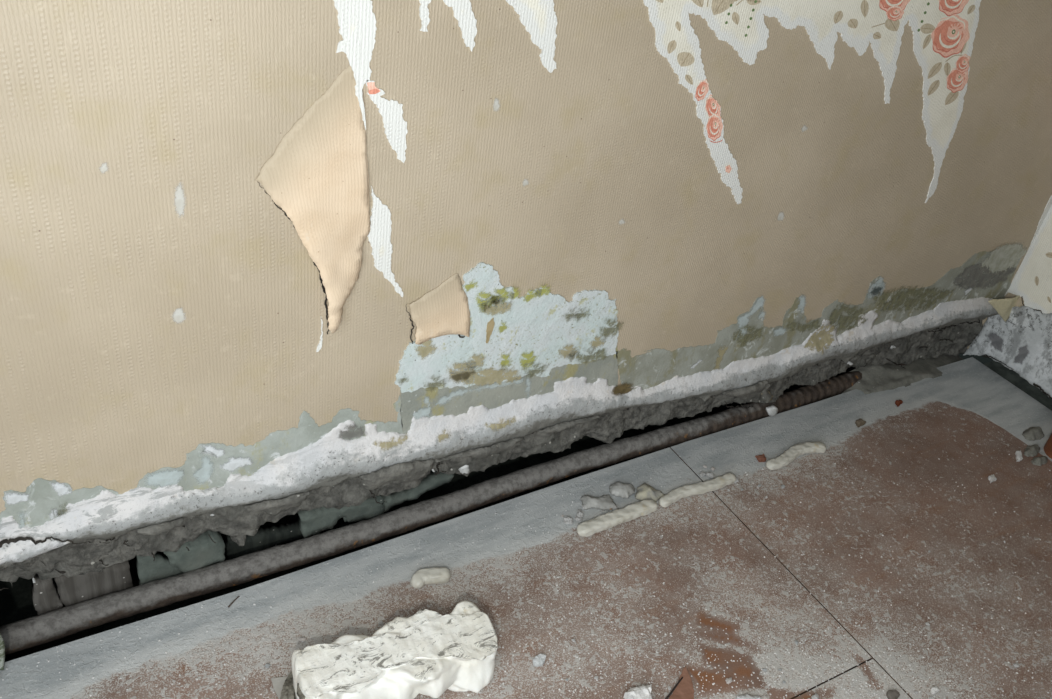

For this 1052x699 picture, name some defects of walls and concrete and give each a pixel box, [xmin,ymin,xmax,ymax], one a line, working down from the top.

peeling [333,0,377,96]
peeling [419,0,477,52]
peeling [505,0,557,73]
damp [465,282,550,333]
damp [416,339,436,359]
damp [428,351,544,391]
peeling [136,244,1023,491]
damp [559,320,622,363]
damp [989,333,1003,351]
damp [1014,345,1028,364]
spalling [0,318,986,584]
crack [0,536,155,590]